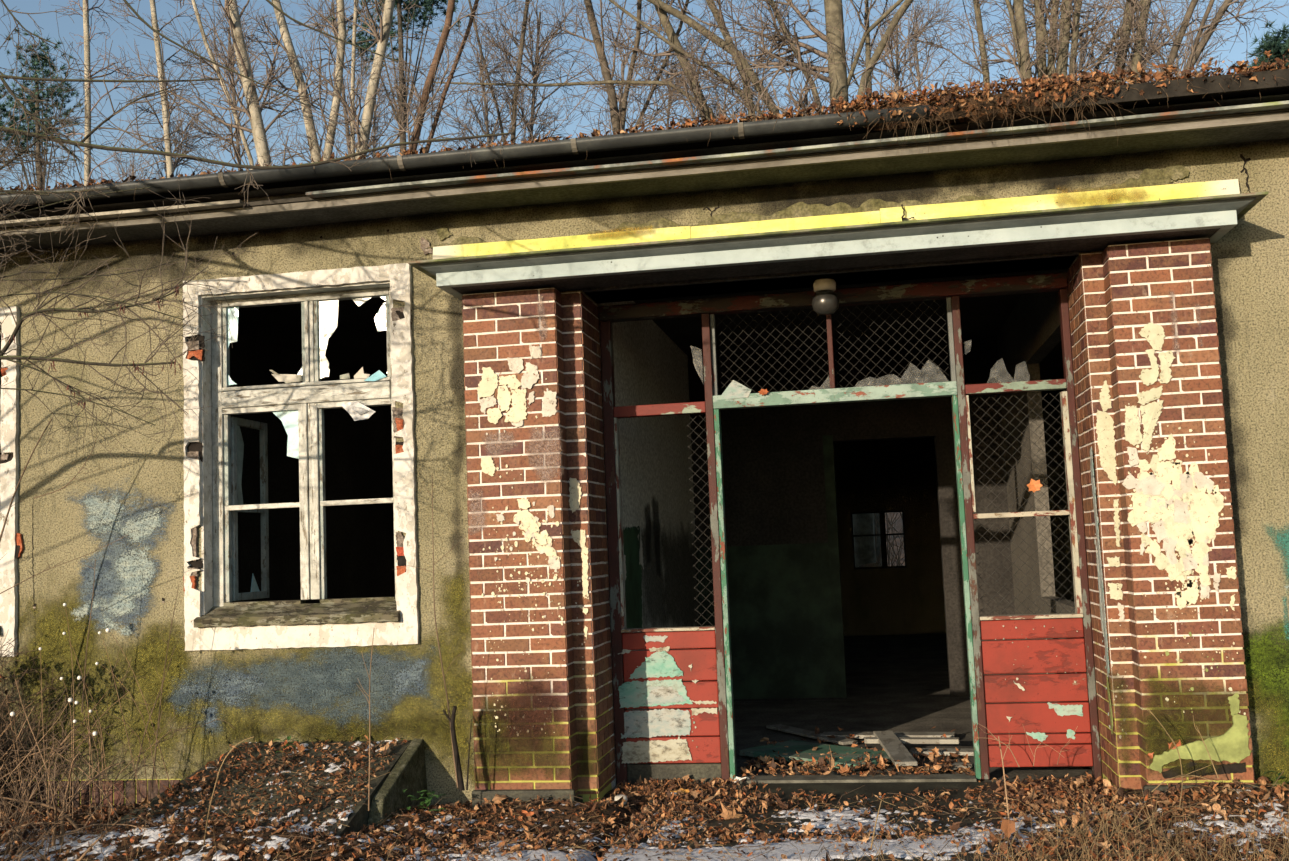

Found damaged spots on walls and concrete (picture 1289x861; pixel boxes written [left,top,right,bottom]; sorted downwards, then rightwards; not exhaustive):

crack [1240,154,1251,193]
damp [1217,307,1232,338]
peeling [477,345,557,435]
damp [1226,430,1245,532]
peeling [481,456,589,732]
peeling [1090,323,1250,778]
peeling [618,526,717,764]
peeling [1026,732,1048,742]
peeling [1047,702,1083,739]